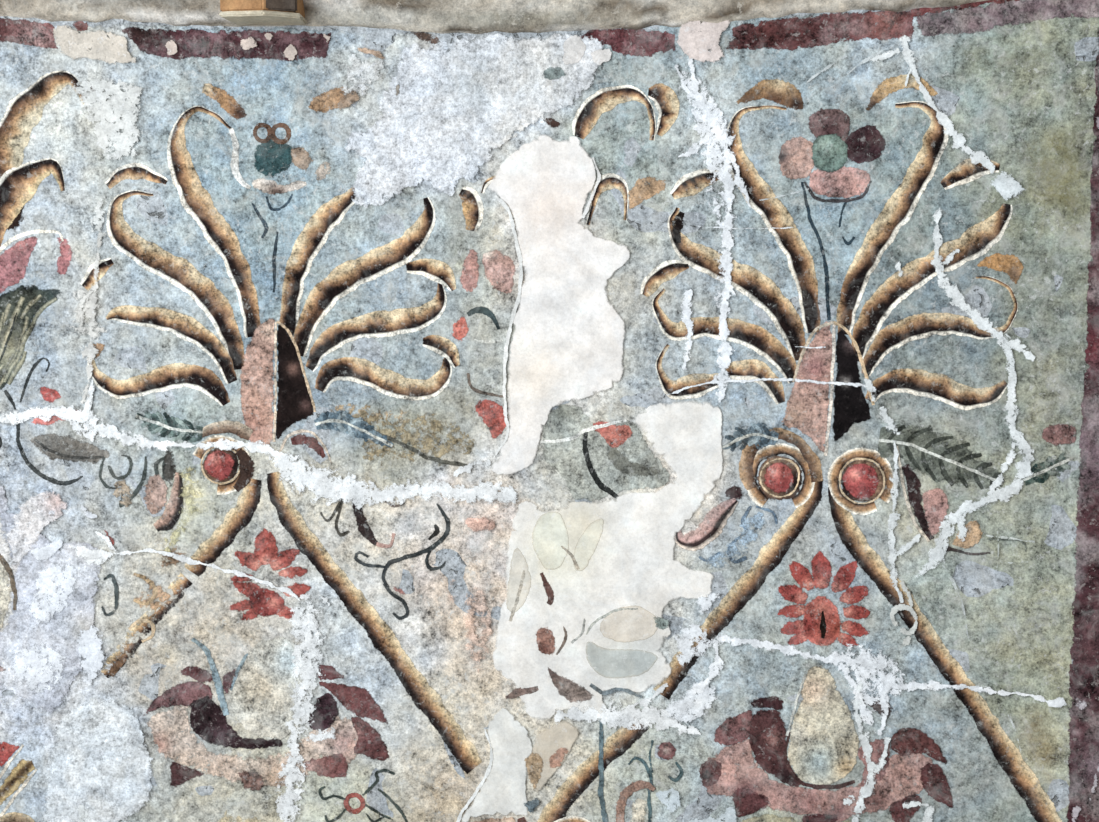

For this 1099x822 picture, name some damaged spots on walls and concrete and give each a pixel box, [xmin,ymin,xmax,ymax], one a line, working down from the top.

crack [69,531,336,822]
crack [0,231,517,509]
flaking render [338,33,630,475]
flaking render [449,401,723,822]
crack [553,58,1066,822]
crack [869,35,995,174]